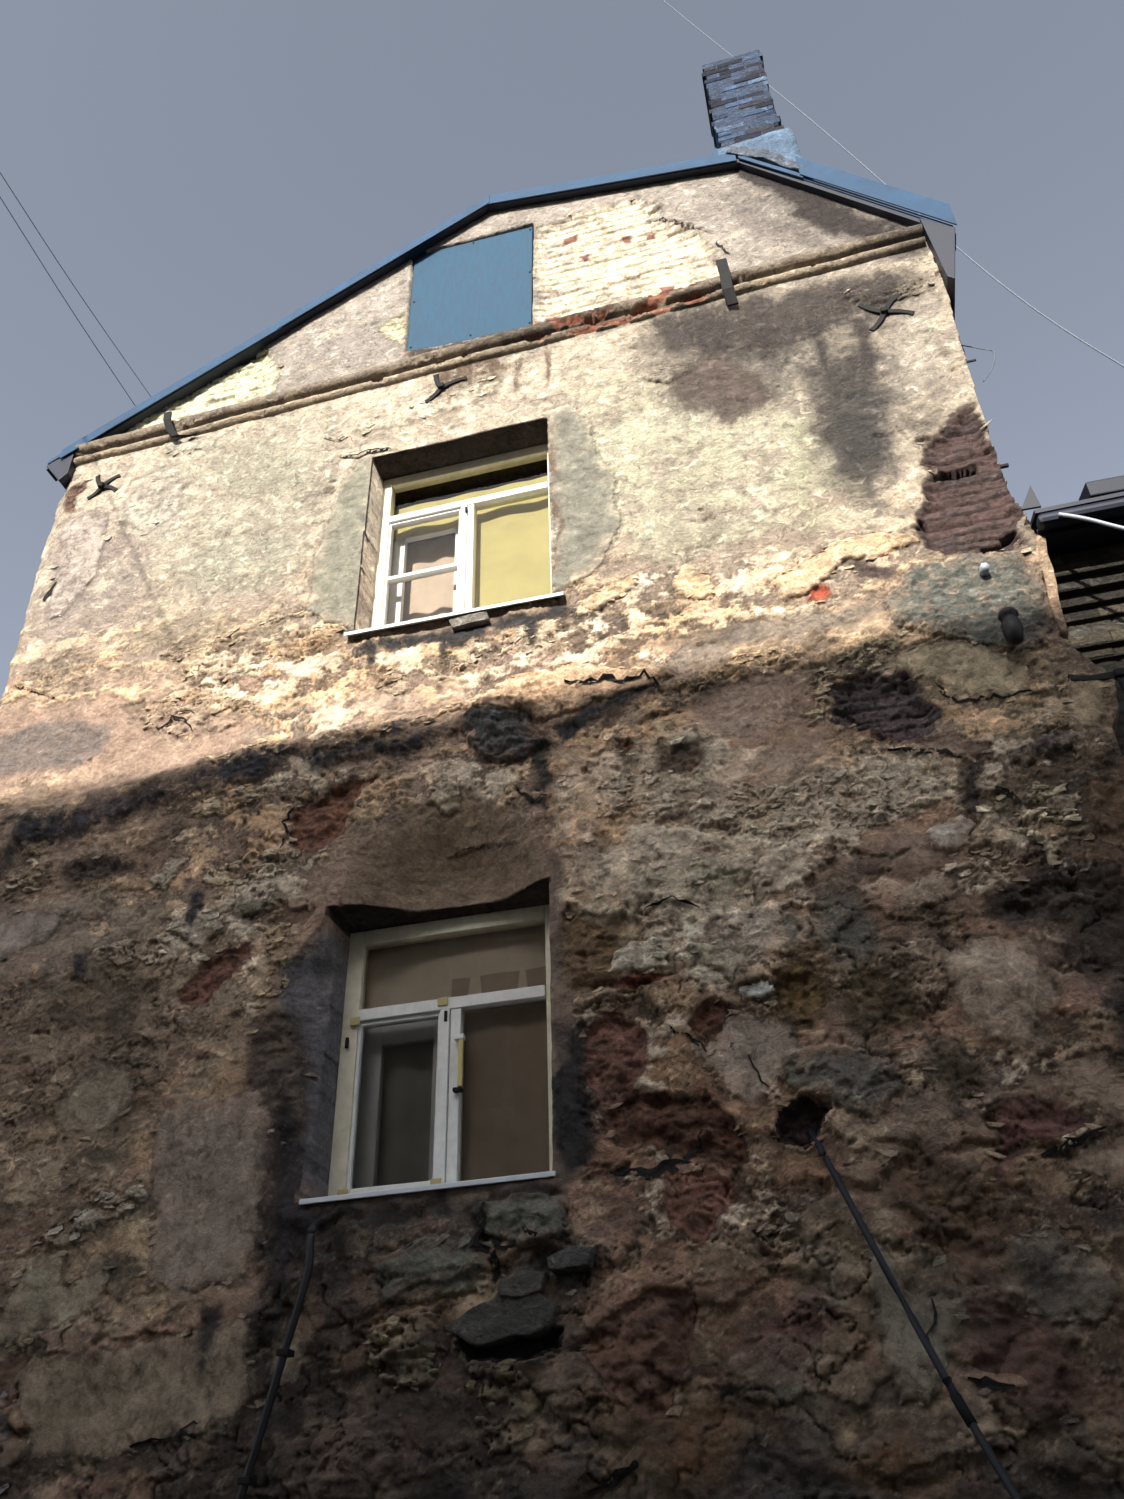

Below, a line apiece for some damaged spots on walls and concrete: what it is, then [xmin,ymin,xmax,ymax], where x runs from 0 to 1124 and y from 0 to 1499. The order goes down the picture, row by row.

flaking render [123,347,284,434]
flaking render [531,197,719,323]
damp [652,269,904,423]
flaking render [772,403,1031,604]
peeling [139,605,347,739]
peeling [200,625,799,765]
peeling [795,631,1034,742]
peeling [555,734,1124,1244]
peeling [0,907,319,1467]
flaking render [871,1043,1124,1285]
flaking render [362,1283,696,1459]
flaking render [861,1219,1086,1423]